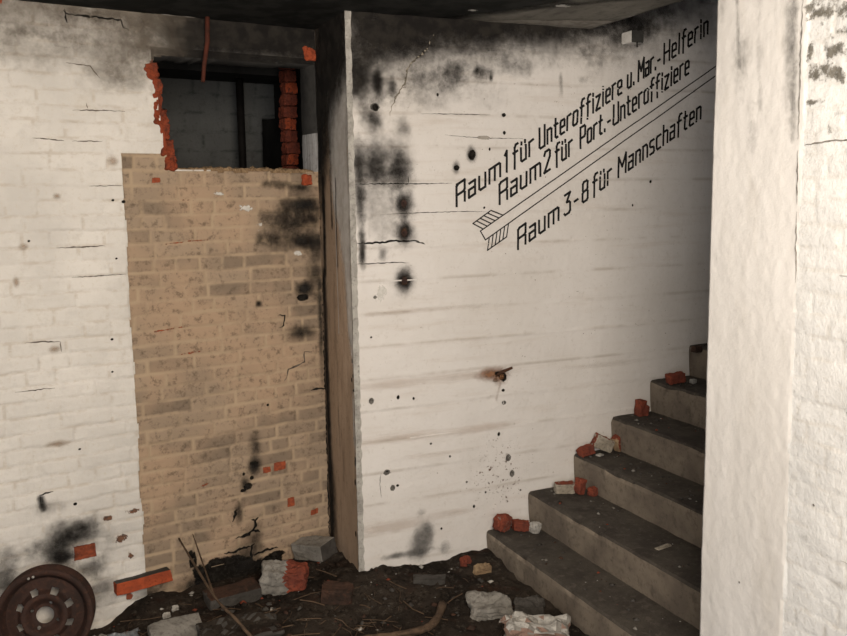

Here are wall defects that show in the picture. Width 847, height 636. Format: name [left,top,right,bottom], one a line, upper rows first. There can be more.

peeling [805,0,847,21]
peeling [806,42,845,83]
water stain [374,71,395,94]
spalling [144,62,314,183]
corrosion [483,370,503,381]
spalling [250,461,286,473]
spalling [74,543,96,561]
crack [224,509,278,560]
water stain [392,524,432,558]